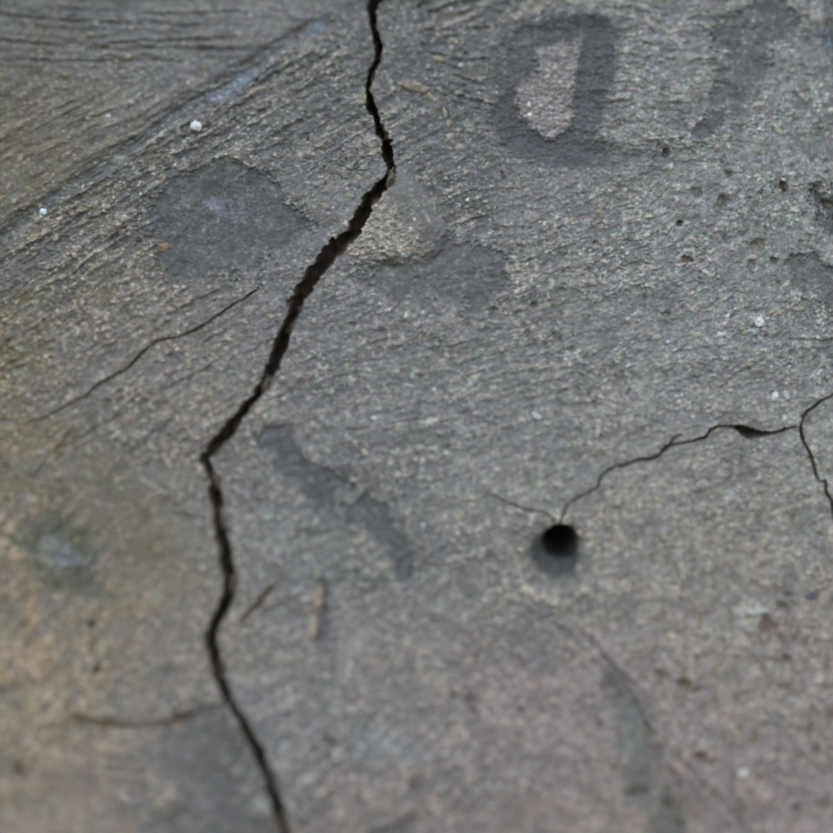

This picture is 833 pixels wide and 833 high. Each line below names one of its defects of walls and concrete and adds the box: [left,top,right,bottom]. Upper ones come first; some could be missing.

crack [15,282,263,426]
crack [198,0,397,833]
crack [483,393,833,523]